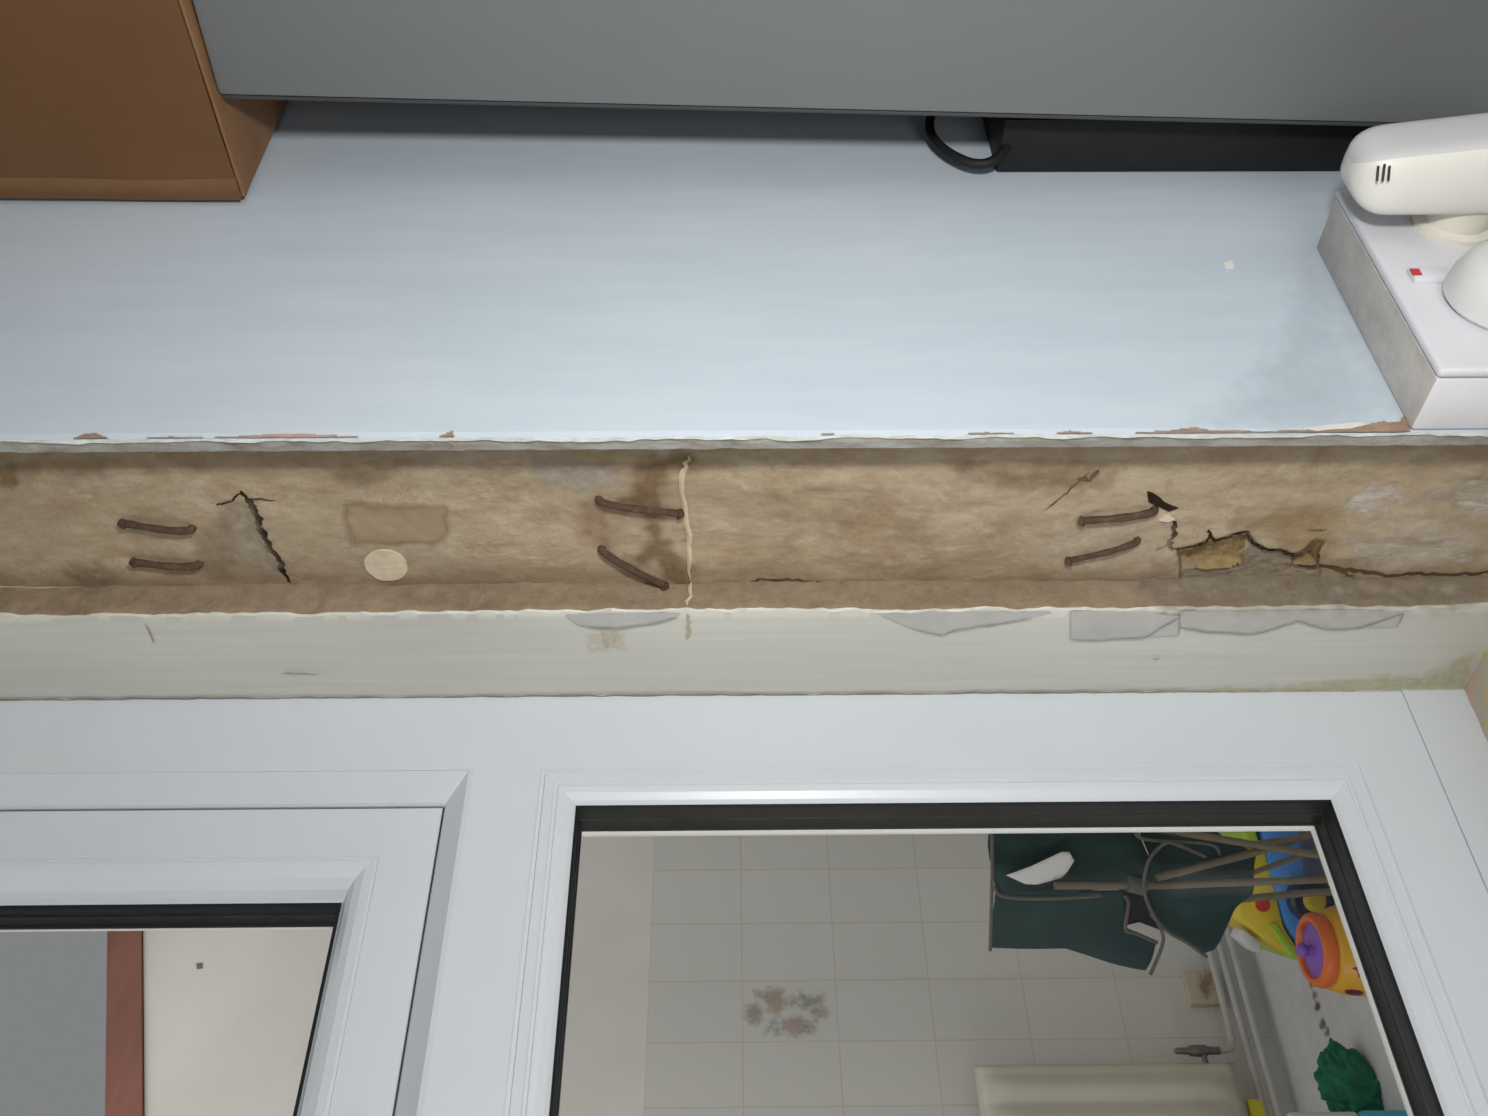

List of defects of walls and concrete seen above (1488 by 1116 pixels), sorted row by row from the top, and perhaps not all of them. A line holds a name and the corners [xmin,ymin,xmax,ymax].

peeling [0,416,1488,445]
corrosion [623,455,692,584]
crack [216,491,291,583]
spalling [1042,491,1327,580]
crack [1294,564,1488,579]
peeling [566,613,681,630]
peeling [879,612,1051,636]
peeling [1070,611,1181,642]